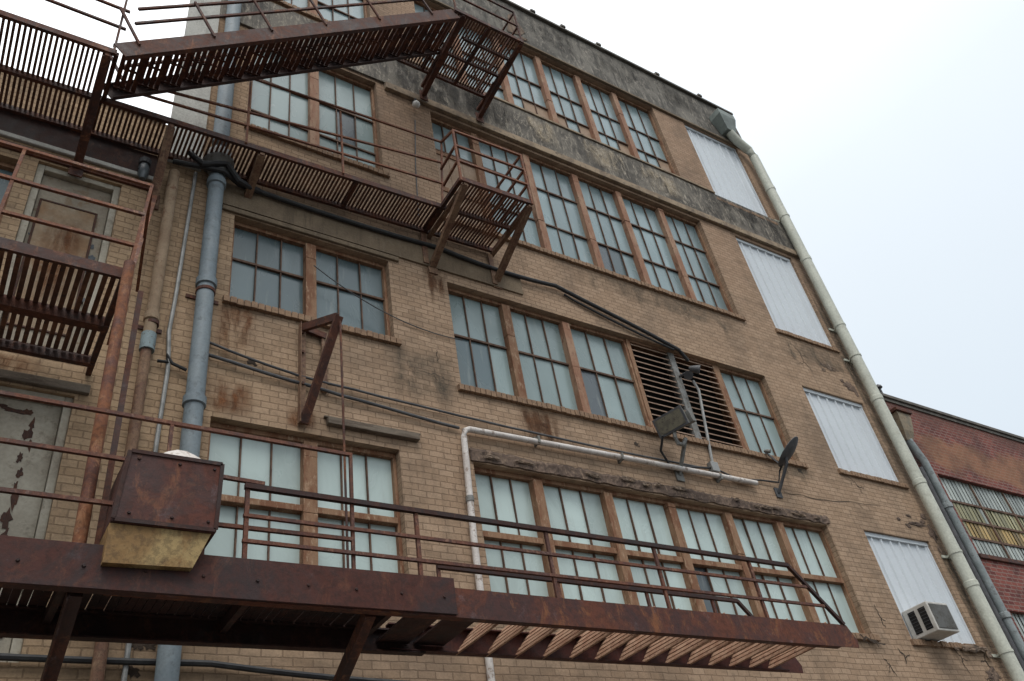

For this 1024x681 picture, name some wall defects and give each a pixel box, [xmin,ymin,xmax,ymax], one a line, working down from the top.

peeling [0,404,35,536]
spalling [897,513,944,555]